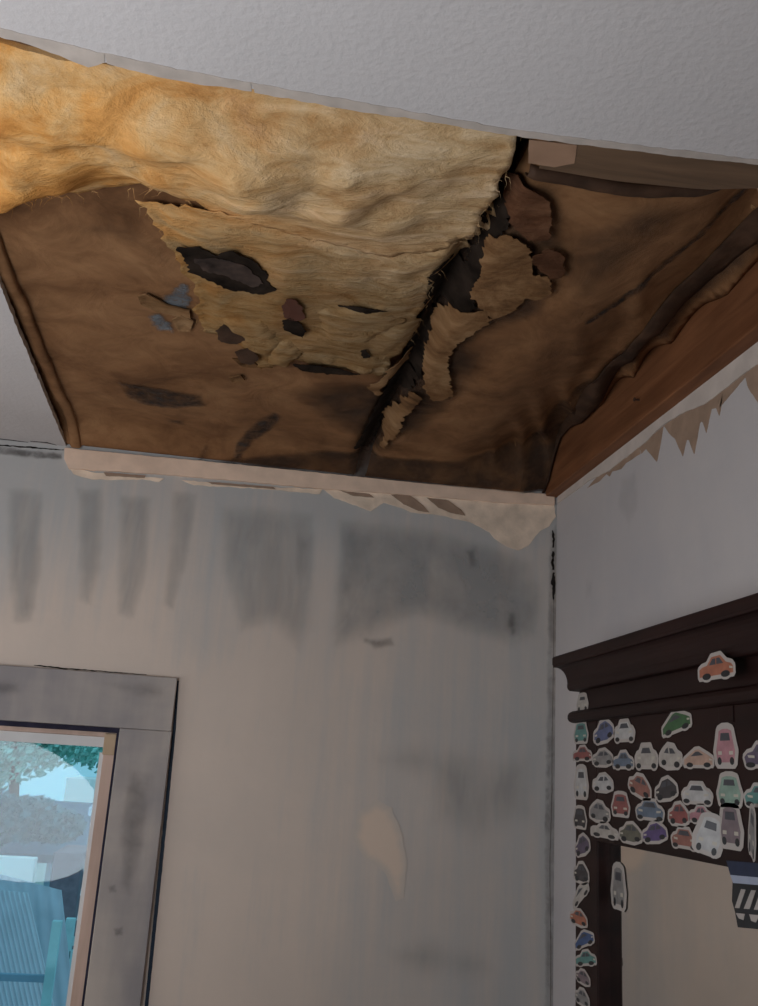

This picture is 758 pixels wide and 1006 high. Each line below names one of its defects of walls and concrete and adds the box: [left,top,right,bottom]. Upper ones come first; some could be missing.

leakage [122,384,200,408]
leakage [222,368,605,493]